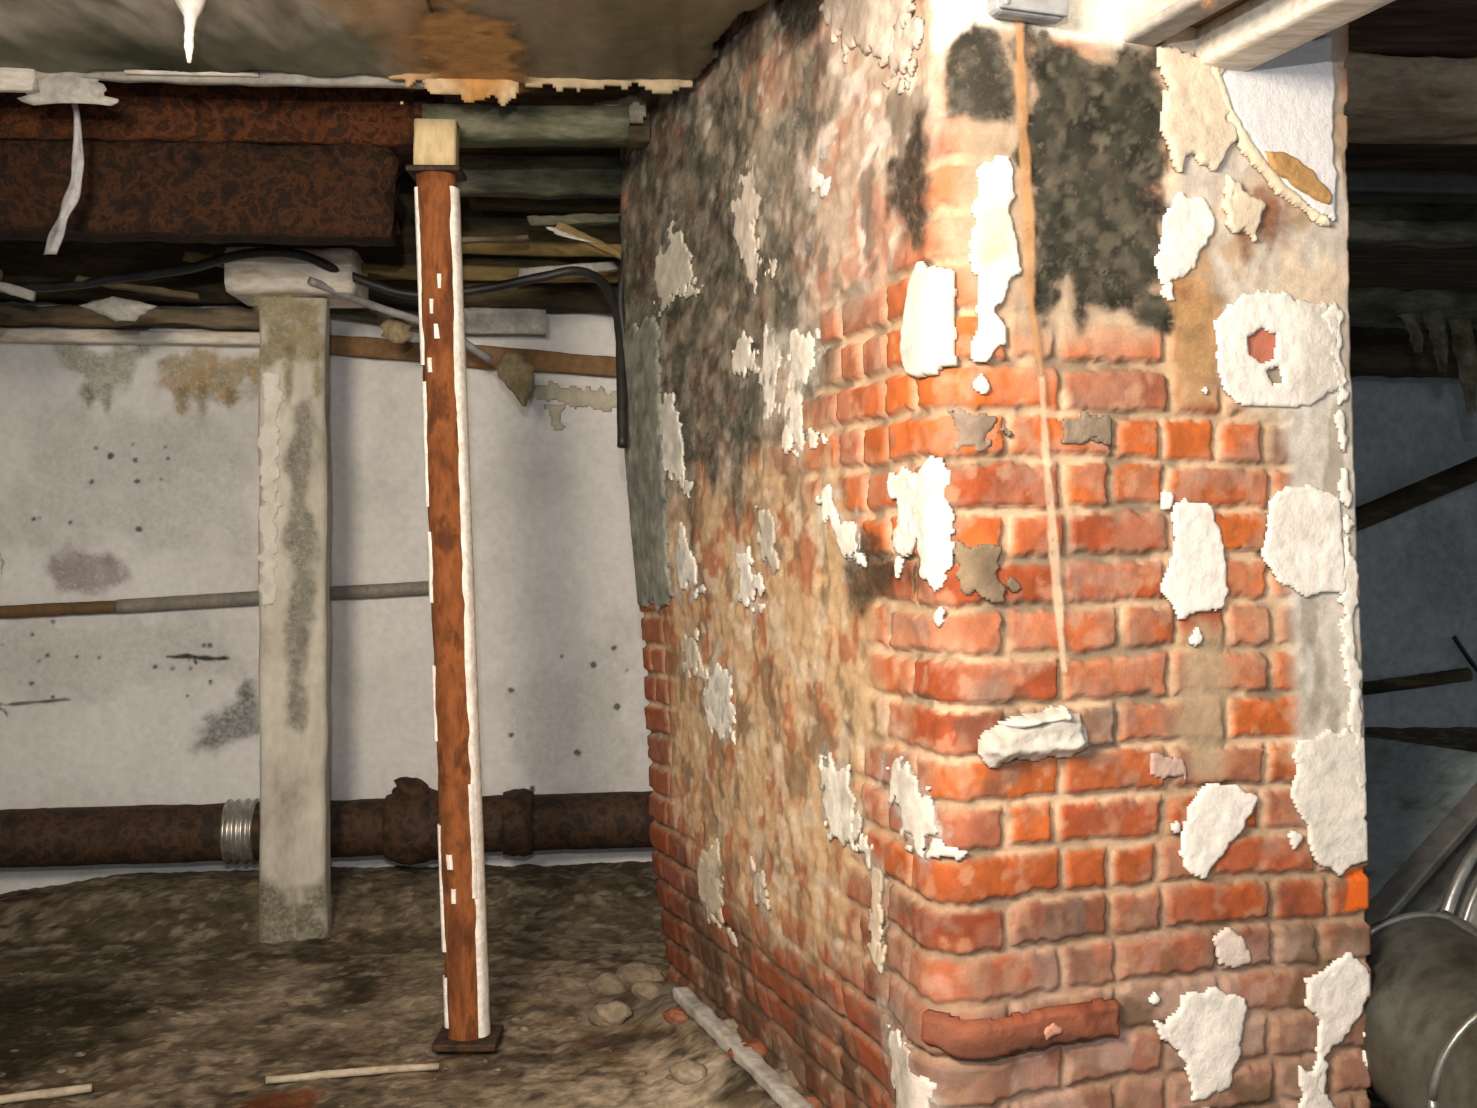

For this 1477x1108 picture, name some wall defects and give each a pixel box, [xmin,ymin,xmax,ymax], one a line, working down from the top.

damp [387,0,528,106]
mould [886,111,926,247]
damp [945,23,1223,381]
peeling [1156,35,1337,243]
mould [620,0,833,546]
peeling [972,373,990,394]
damp [161,294,324,728]
peeling [854,550,867,567]
flaking render [886,405,1021,627]
crack [0,699,66,714]
peeling [925,838,967,861]
peeling [1298,1065,1336,1108]